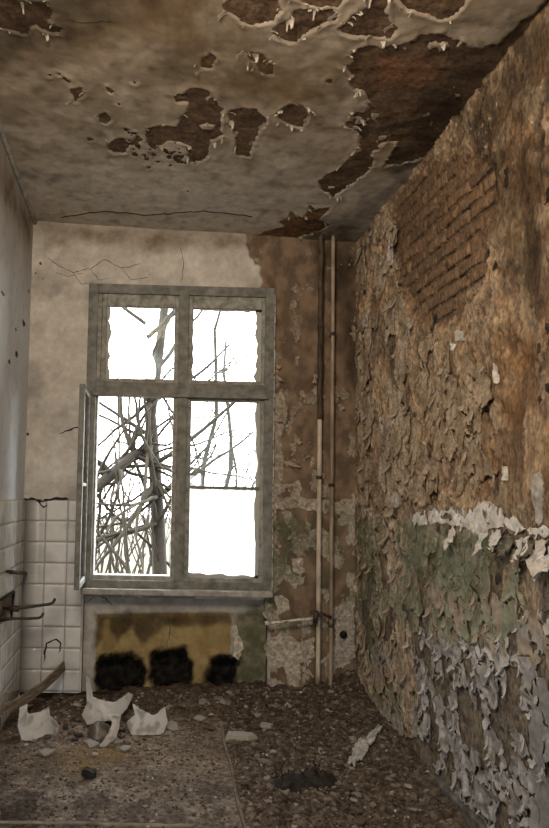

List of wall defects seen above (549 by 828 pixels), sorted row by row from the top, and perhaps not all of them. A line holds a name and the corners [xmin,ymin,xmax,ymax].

peeling [0,0,62,41]
peeling [194,53,216,76]
peeling [94,112,112,126]
peeling [106,88,315,171]
crack [61,210,252,218]
peeling [217,0,549,828]
leakage [100,614,189,638]